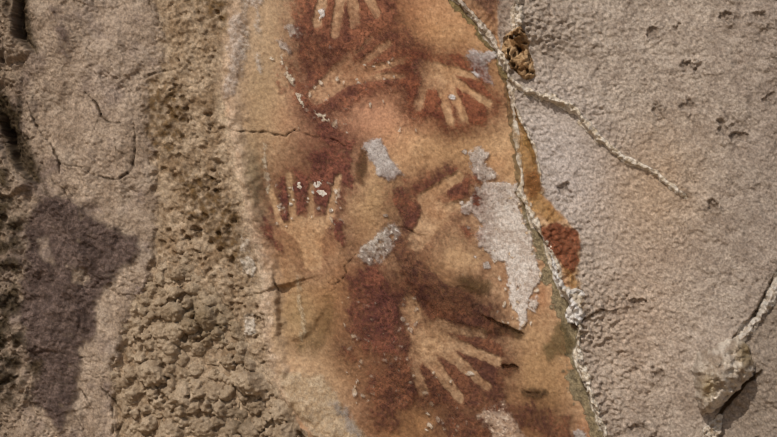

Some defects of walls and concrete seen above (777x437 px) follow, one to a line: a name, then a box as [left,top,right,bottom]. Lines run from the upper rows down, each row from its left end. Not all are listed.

spalling [361,138,402,181]
spalling [358,214,400,265]
spalling [460,146,540,330]
crack [448,0,687,437]
crack [733,272,777,342]
spalling [476,400,524,437]
crack [702,414,723,437]